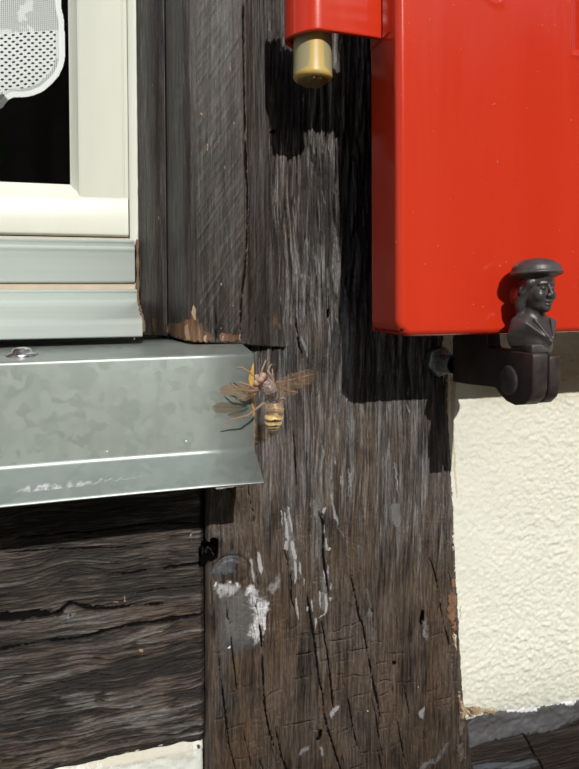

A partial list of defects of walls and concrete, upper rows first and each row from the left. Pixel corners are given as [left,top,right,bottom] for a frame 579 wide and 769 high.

crack [0,522,201,650]
peeling [280,507,332,629]
crack [318,512,329,596]
crack [217,551,447,769]
crack [429,559,451,644]